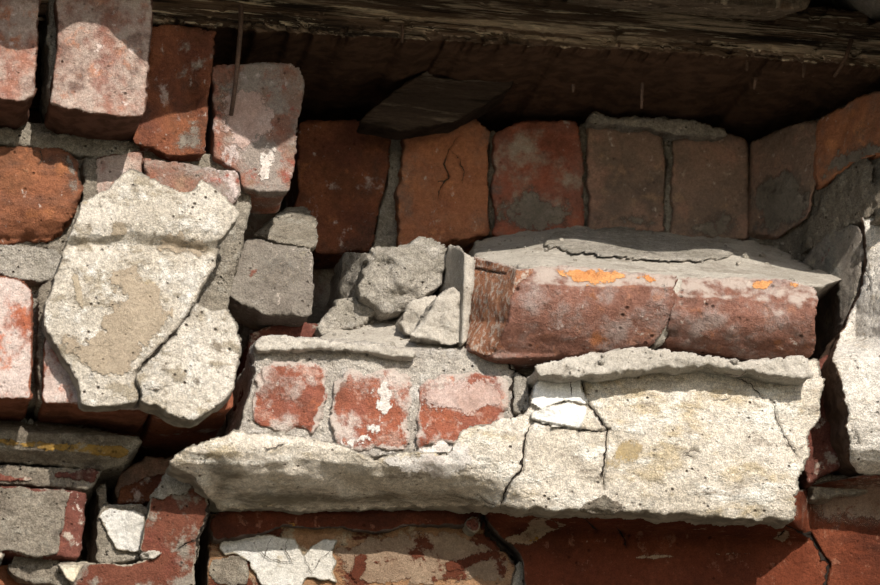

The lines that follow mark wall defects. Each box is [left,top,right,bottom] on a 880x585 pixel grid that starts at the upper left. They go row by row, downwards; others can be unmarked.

crack [438,137,465,198]
crack [137,306,193,371]
crack [508,364,532,412]
crack [479,382,610,559]
peeling [209,516,509,585]
peeling [505,518,566,545]